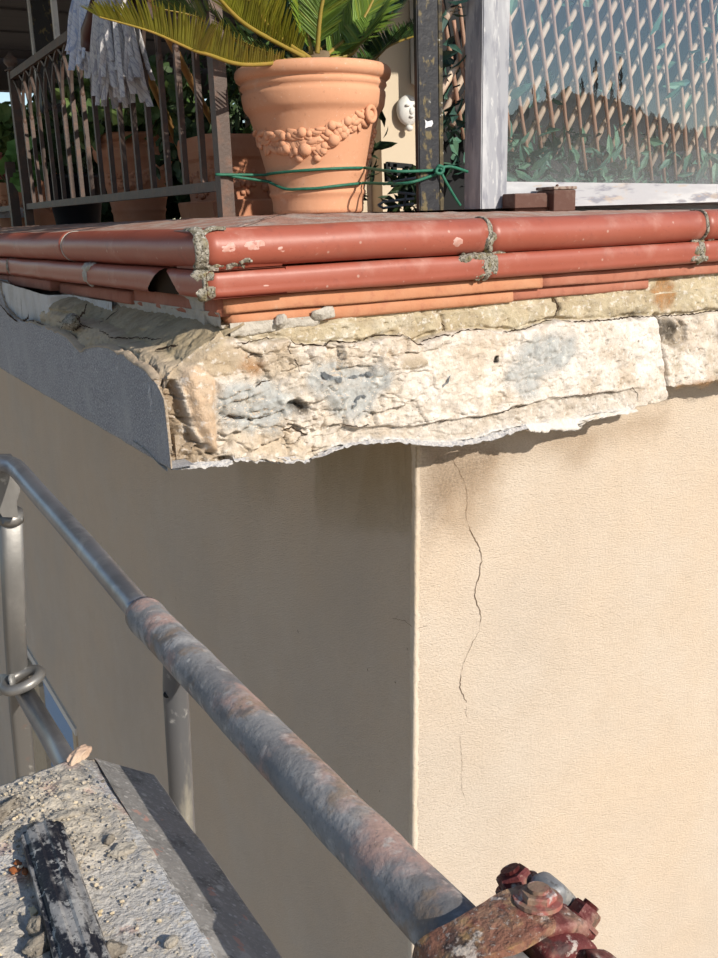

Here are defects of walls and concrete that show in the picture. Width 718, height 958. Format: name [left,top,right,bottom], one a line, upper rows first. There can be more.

spalling [2,273,718,471]
crack [237,299,718,378]